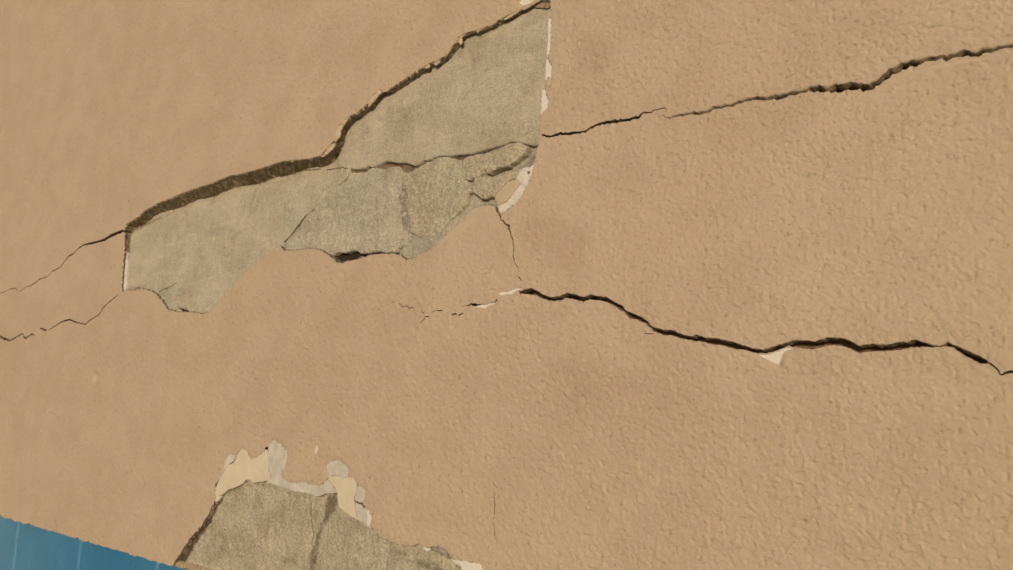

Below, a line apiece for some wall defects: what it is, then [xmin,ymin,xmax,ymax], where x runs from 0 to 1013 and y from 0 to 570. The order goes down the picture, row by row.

crack [527,43,1013,146]
spalling [121,0,552,314]
crack [284,150,492,242]
crack [0,296,116,342]
crack [1,230,129,293]
crack [391,207,1013,376]
spalling [173,440,485,570]